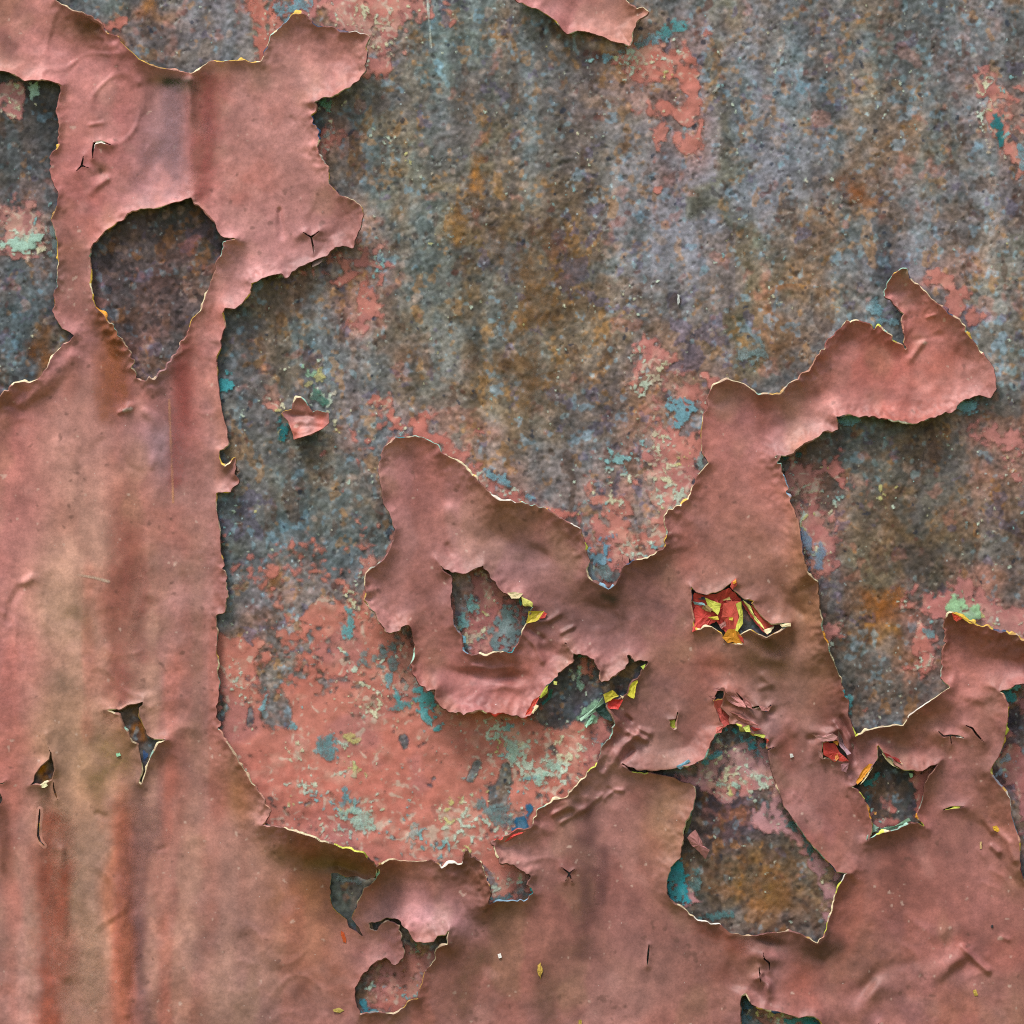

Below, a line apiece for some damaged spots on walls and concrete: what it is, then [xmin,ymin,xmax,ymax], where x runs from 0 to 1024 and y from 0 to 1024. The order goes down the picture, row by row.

peeling [0,71,74,396]
peeling [89,197,235,381]
spalling [429,440,528,504]
peeling [777,386,1024,737]
peeling [440,566,547,656]
peeling [690,579,791,645]
peeling [106,702,165,784]
peeling [621,687,847,943]
peeling [812,731,854,772]
peeling [852,745,939,840]
peeling [330,869,380,936]
peeling [355,917,449,1015]